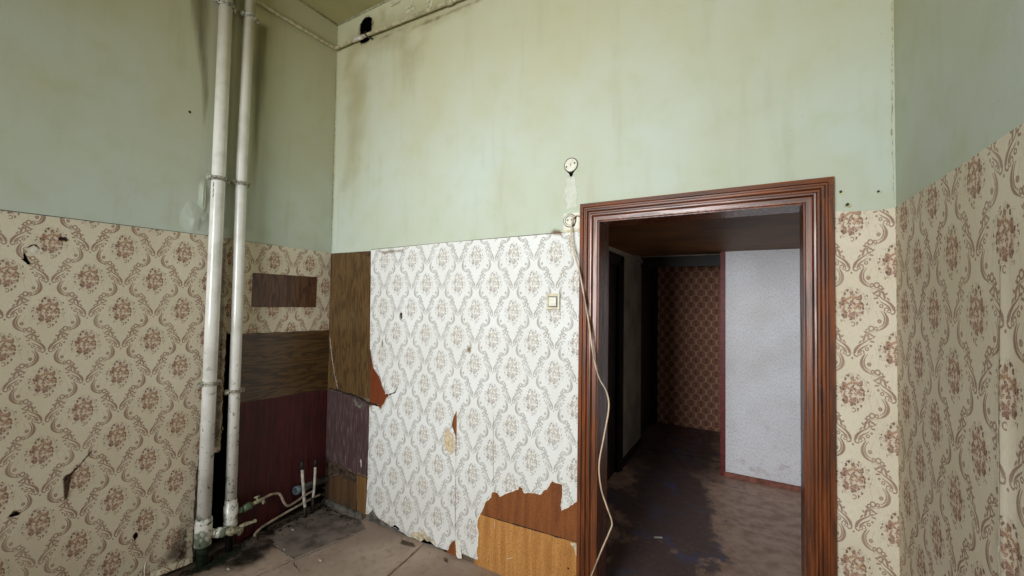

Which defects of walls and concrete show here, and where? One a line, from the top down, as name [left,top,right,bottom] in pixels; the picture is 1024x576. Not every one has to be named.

leakage [150,533,275,576]